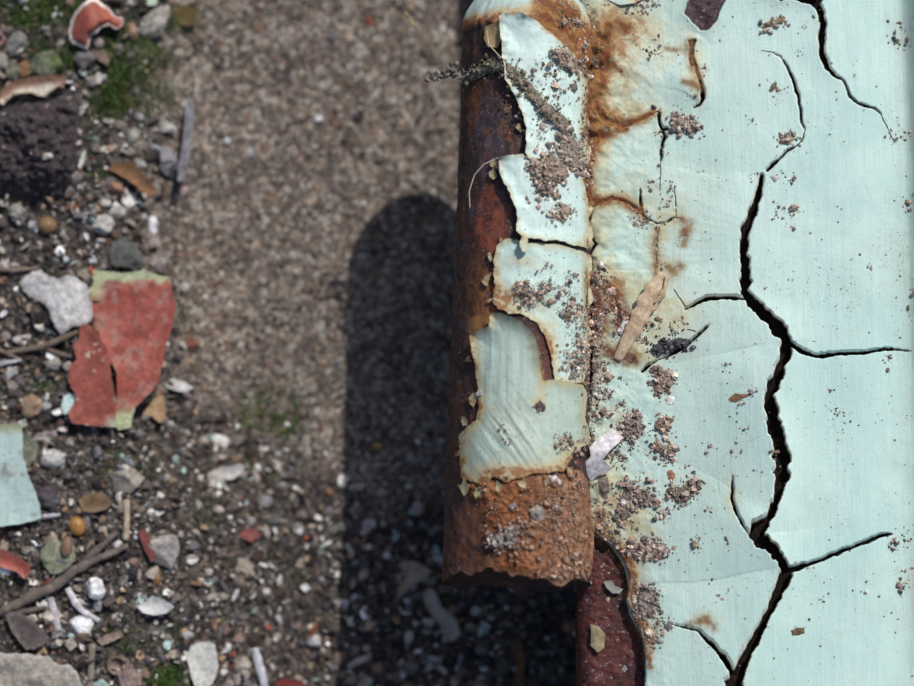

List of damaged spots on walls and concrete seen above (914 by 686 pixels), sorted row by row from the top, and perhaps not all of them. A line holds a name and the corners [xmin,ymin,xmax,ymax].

corrosion [532,0,655,218]
crack [587,36,679,258]
corrosion [665,38,701,90]
peeling [684,0,725,31]
crack [779,0,893,139]
peeling [455,13,594,499]
corrosion [586,272,639,365]
crack [641,50,912,686]
corrosion [466,470,654,669]
peeling [598,474,610,500]